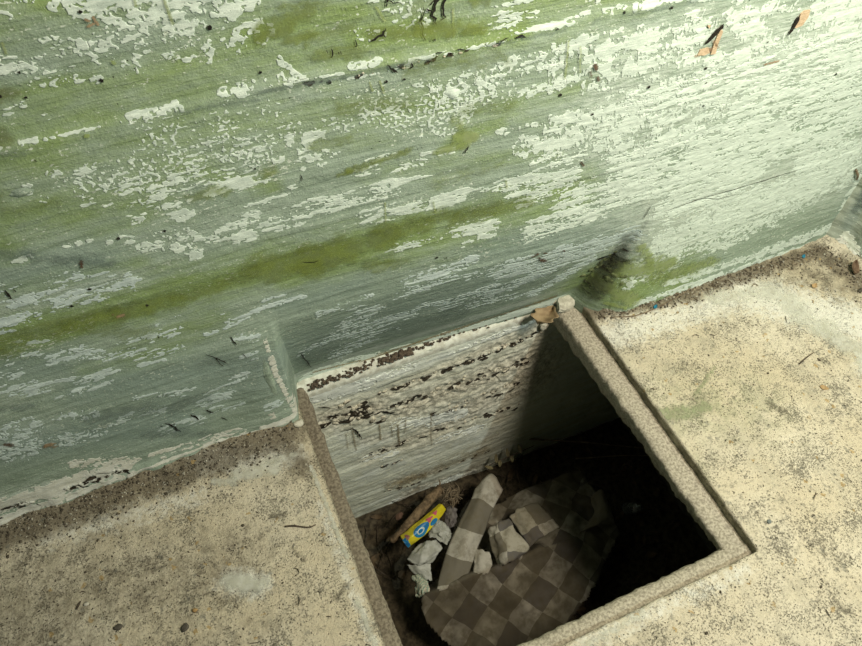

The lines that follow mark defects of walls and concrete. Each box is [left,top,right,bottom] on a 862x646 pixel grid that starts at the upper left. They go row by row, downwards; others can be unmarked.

peeling [0,0,276,88]
peeling [217,79,256,114]
peeling [276,55,383,88]
peeling [18,125,101,147]
peeling [73,99,456,261]
water stain [338,148,411,176]
peeling [345,0,862,277]
water stain [246,223,423,282]
water stain [586,243,716,310]
peeling [632,223,832,308]
water stain [313,296,556,373]
spalling [0,225,753,646]